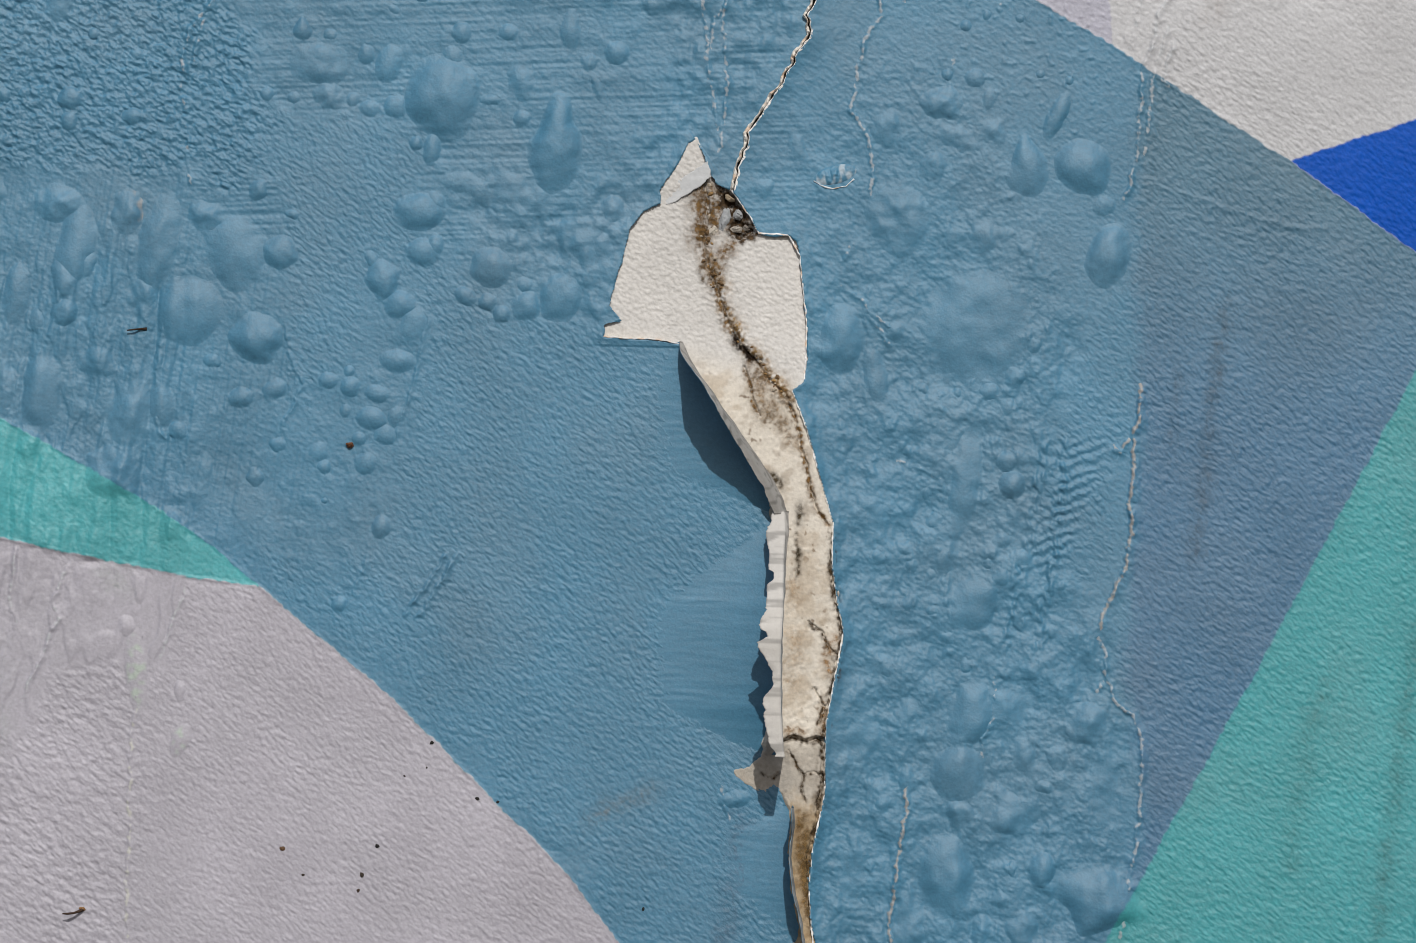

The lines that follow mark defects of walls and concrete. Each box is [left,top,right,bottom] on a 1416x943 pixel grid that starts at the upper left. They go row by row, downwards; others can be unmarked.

crack [846,0,911,197]
crack [1120,0,1180,205]
peeling [604,137,844,943]
crack [699,0,843,926]
crack [1094,382,1154,942]